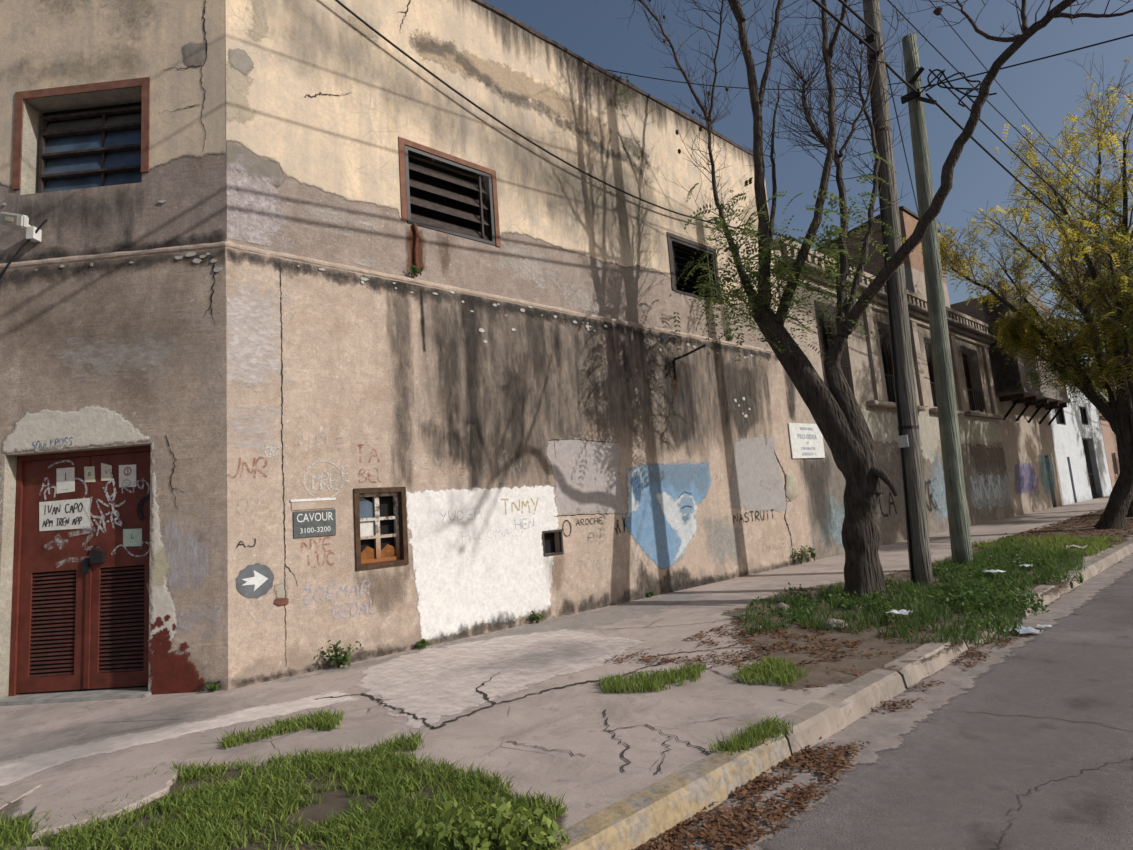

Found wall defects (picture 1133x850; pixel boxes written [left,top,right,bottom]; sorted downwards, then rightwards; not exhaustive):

crack [161,0,207,150]
peeling [226,62,253,121]
water stain [416,41,642,173]
corrosion [407,228,423,272]
crack [203,257,216,327]
water stain [394,292,768,487]
water stain [785,373,795,419]
crack [165,435,182,508]
peeling [0,404,205,695]
crack [476,672,500,704]